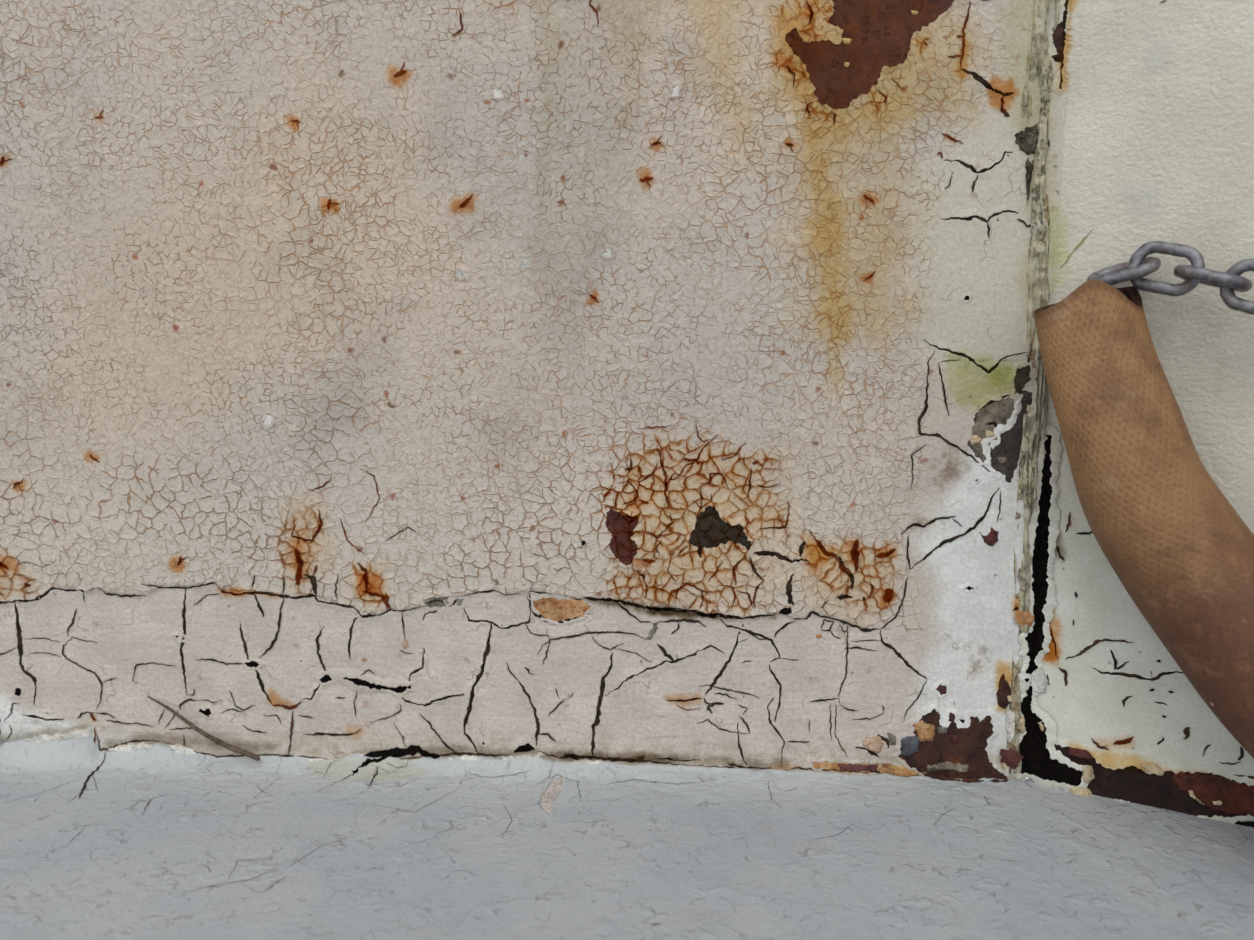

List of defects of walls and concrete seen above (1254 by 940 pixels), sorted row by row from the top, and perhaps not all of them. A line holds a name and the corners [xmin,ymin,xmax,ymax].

corrosion [948,2,1015,117]
peeling [963,360,1041,491]
corrosion [277,509,323,596]
corrosion [340,518,388,610]
crack [0,334,1031,836]
corrosion [602,420,790,611]
corrosion [806,530,896,616]
peeling [854,704,1015,783]
crack [182,836,350,893]